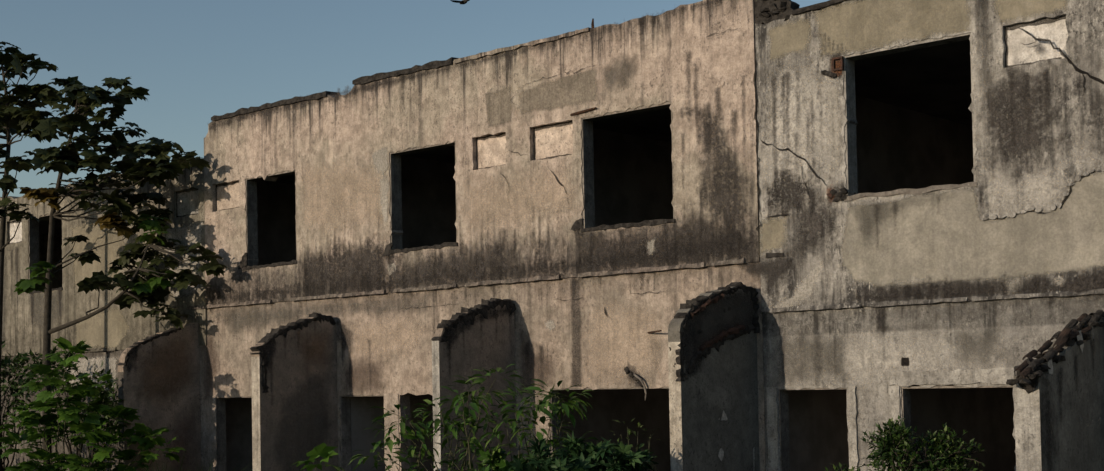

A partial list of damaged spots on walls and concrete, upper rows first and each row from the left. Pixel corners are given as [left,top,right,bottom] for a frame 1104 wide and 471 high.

leakage [210,66,446,130]
crack [707,28,826,231]
peeling [768,0,1104,294]
leakage [986,67,1064,172]
crack [1019,28,1104,92]
leakage [210,91,843,390]
spalling [261,347,269,393]
spalling [624,366,643,387]
spalling [669,264,824,381]
leakage [857,267,1104,330]